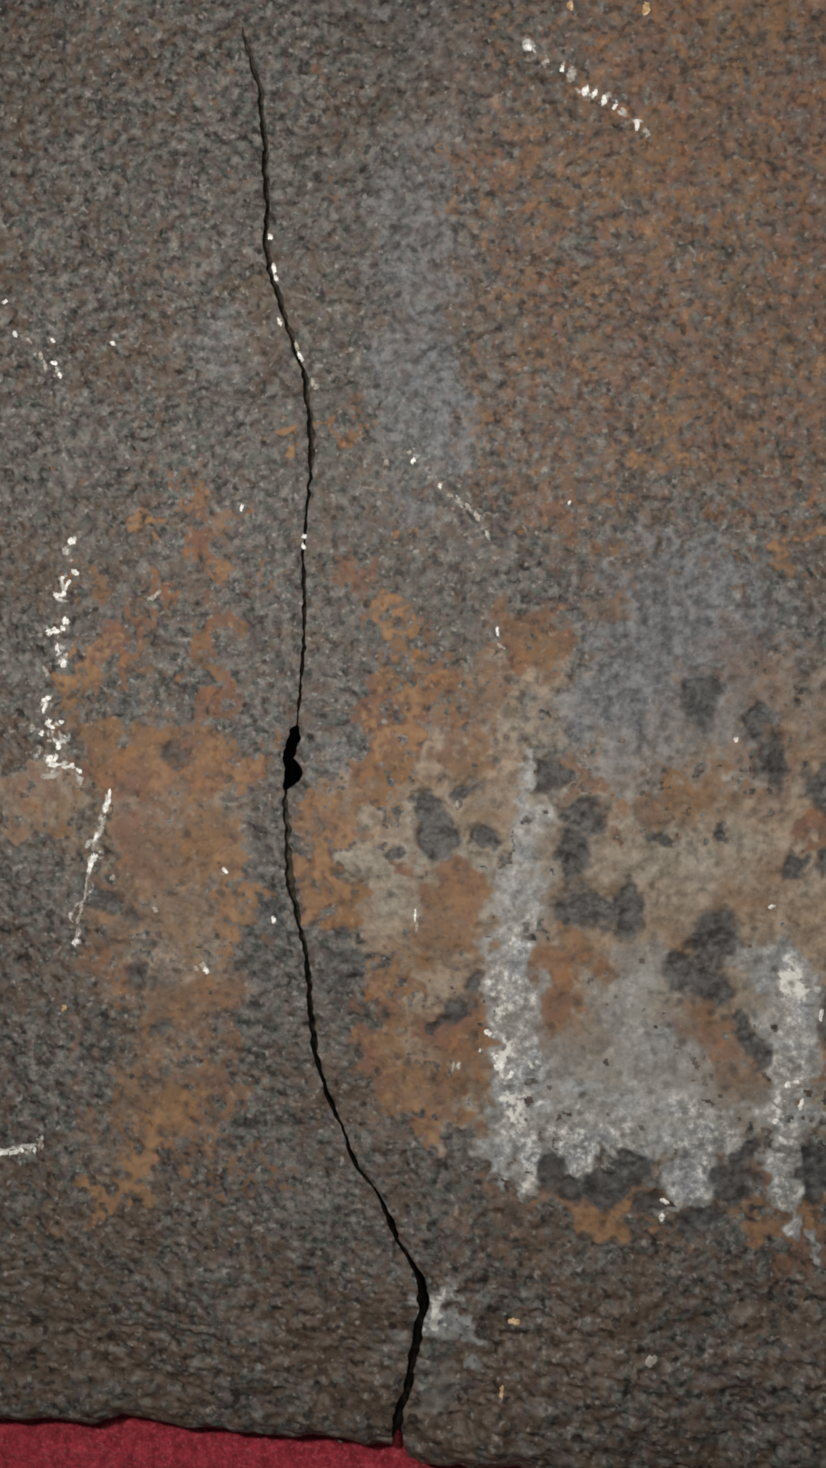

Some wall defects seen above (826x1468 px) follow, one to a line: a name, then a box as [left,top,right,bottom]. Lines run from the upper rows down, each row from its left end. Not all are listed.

rust [0,389,369,1262]
damp [155,286,272,430]
crack [242,26,430,1442]
damp [321,0,509,551]
rust [344,855,707,1318]
rust [289,0,826,930]
damp [300,508,826,1268]
rust [657,999,771,1110]
rust [729,1158,826,1312]